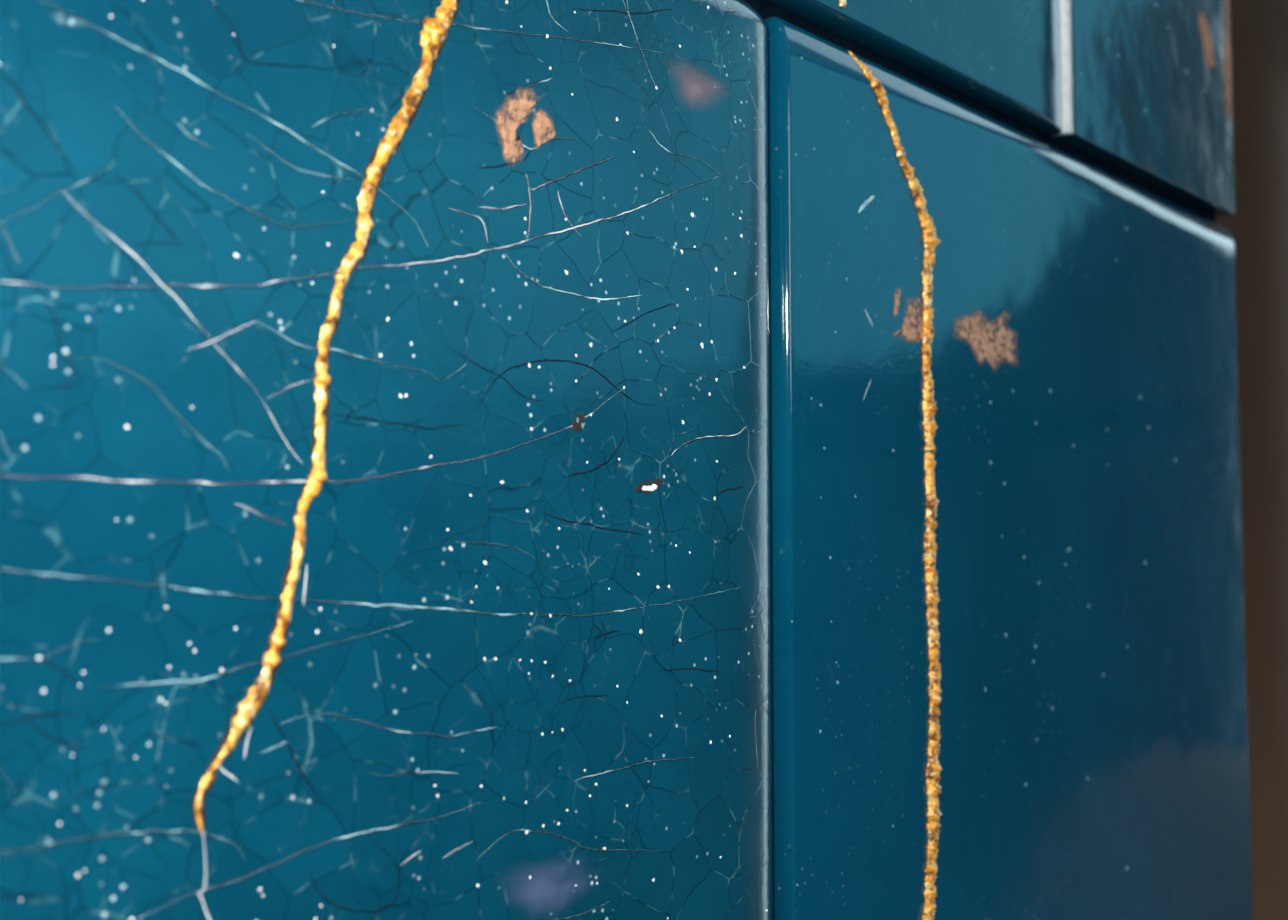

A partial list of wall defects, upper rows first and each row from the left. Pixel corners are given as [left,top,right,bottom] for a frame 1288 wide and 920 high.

crack [0,0,747,920]
peeling [497,91,555,162]
crack [848,50,942,920]
peeling [957,312,1016,368]